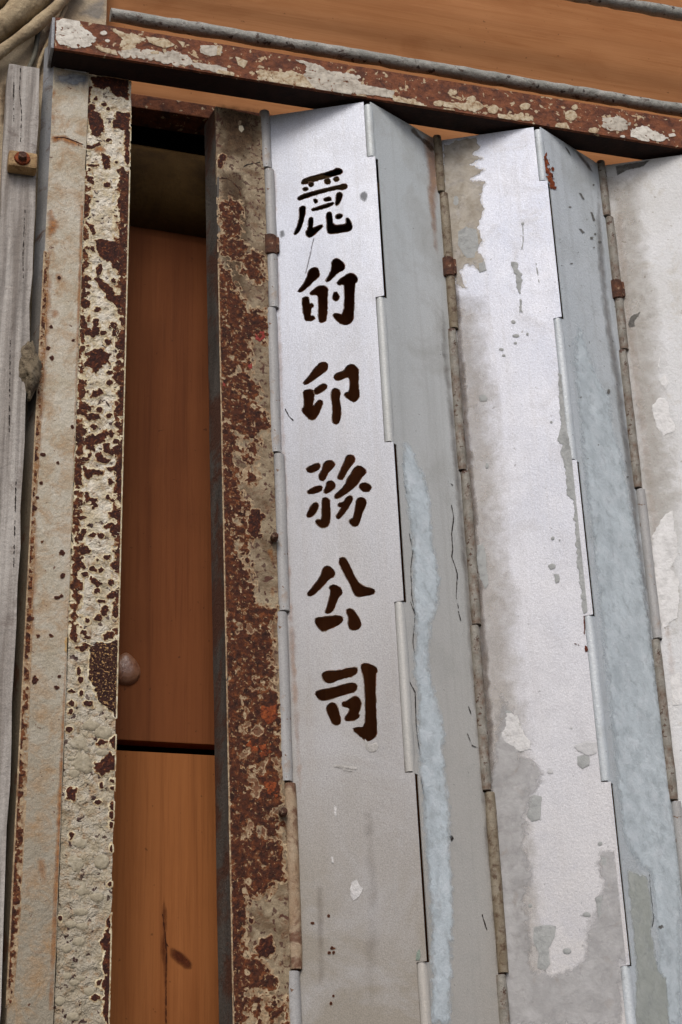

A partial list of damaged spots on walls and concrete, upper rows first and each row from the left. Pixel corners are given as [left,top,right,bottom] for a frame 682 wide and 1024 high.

peeling [40,18,534,121]
corrosion [544,152,557,190]
peeling [555,104,578,129]
peeling [588,116,676,142]
corrosion [53,75,132,738]
corrosion [216,107,290,1024]
corrosion [55,760,79,901]
corrosion [92,734,117,853]
corrosion [89,912,112,1024]